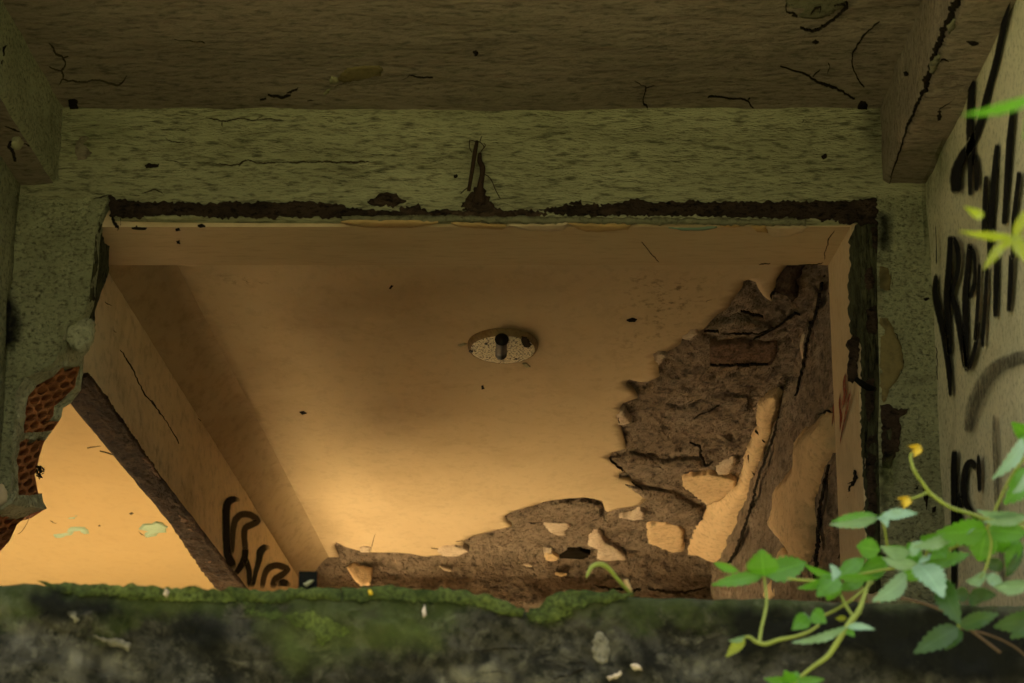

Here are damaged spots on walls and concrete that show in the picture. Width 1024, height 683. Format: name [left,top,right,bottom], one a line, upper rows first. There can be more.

crack [49,43,126,87]
crack [780,21,880,100]
crack [889,0,961,184]
spalling [0,210,238,591]
crack [114,331,179,444]
spalling [437,265,829,577]
water stain [28,589,122,618]
spalling [335,542,409,595]
water stain [729,603,1024,679]